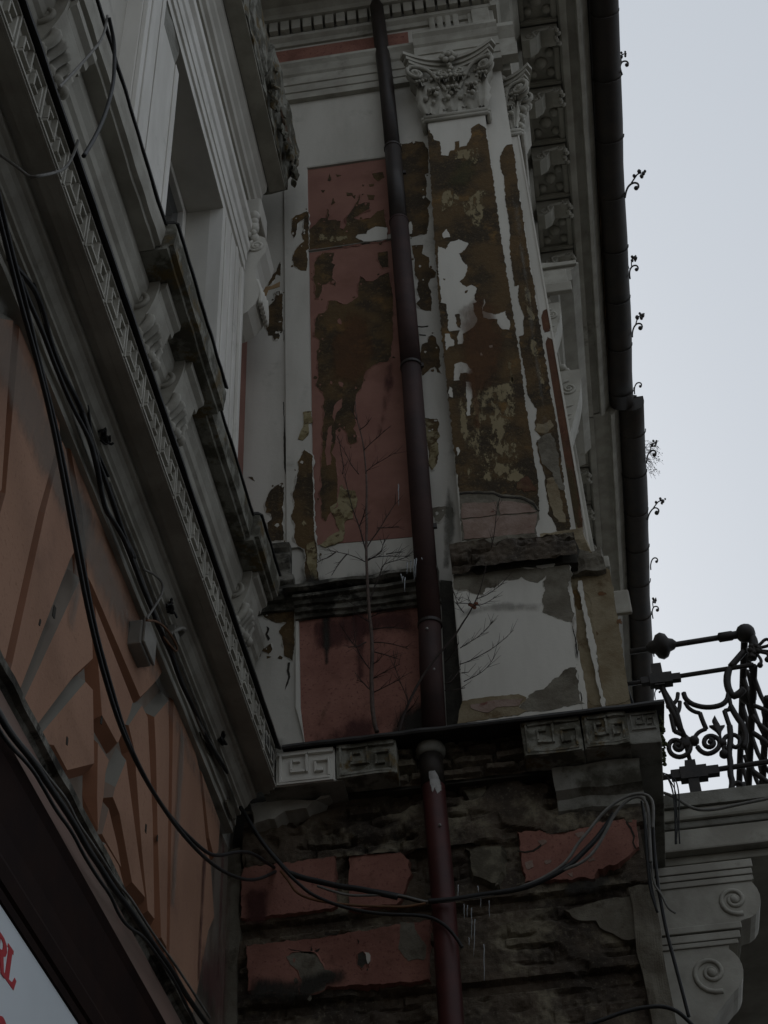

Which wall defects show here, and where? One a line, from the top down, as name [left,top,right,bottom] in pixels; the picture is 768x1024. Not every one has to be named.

peeling [263,172,395,580]
peeling [400,124,583,541]
peeling [429,770,441,793]
peeling [451,565,630,724]